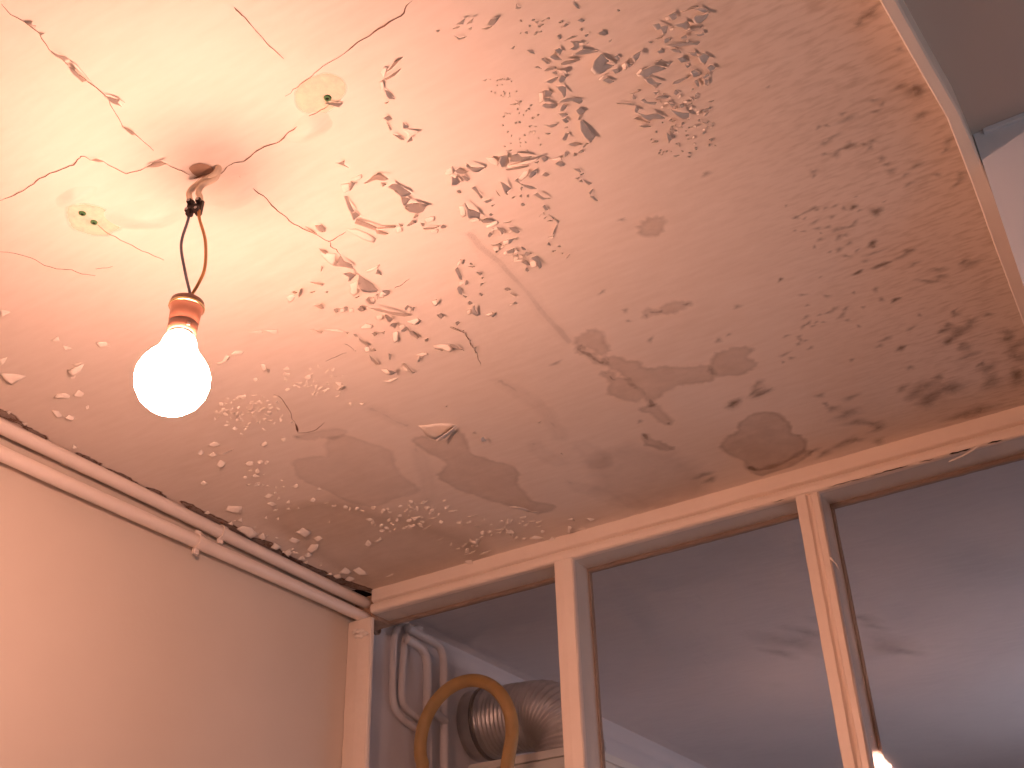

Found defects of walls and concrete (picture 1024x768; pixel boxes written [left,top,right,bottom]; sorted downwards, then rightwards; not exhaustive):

crack [286,1,412,96]
crack [0,6,189,201]
crack [221,107,345,252]
peeling [337,161,446,243]
peeling [379,57,420,143]
peeling [445,3,716,272]
peeling [286,249,496,383]
flaking render [0,409,48,439]
peeling [52,362,89,421]
flaking render [72,444,166,498]
peeling [213,364,365,447]
flaking render [180,460,372,592]